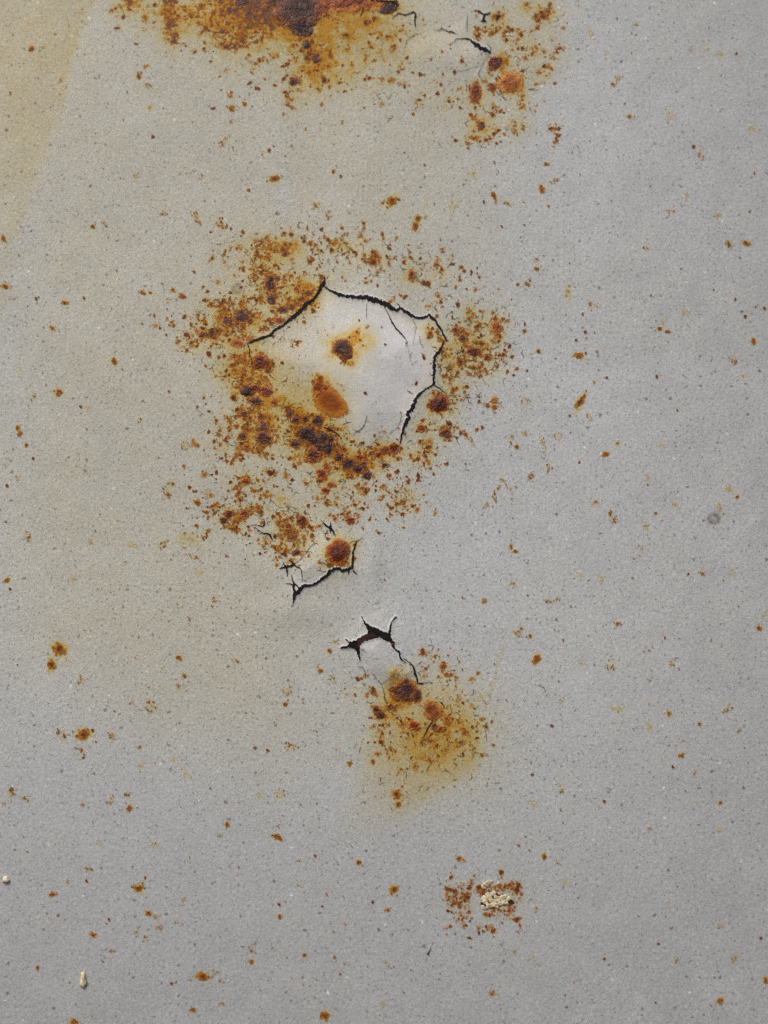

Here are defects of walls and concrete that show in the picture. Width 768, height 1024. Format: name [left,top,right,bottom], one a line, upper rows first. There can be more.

rust [97,0,637,200]
crack [324,0,506,100]
crack [247,276,447,447]
rust [138,200,562,624]
crack [279,519,361,603]
crack [338,614,451,742]
rust [311,627,507,820]
peeling [436,870,535,946]